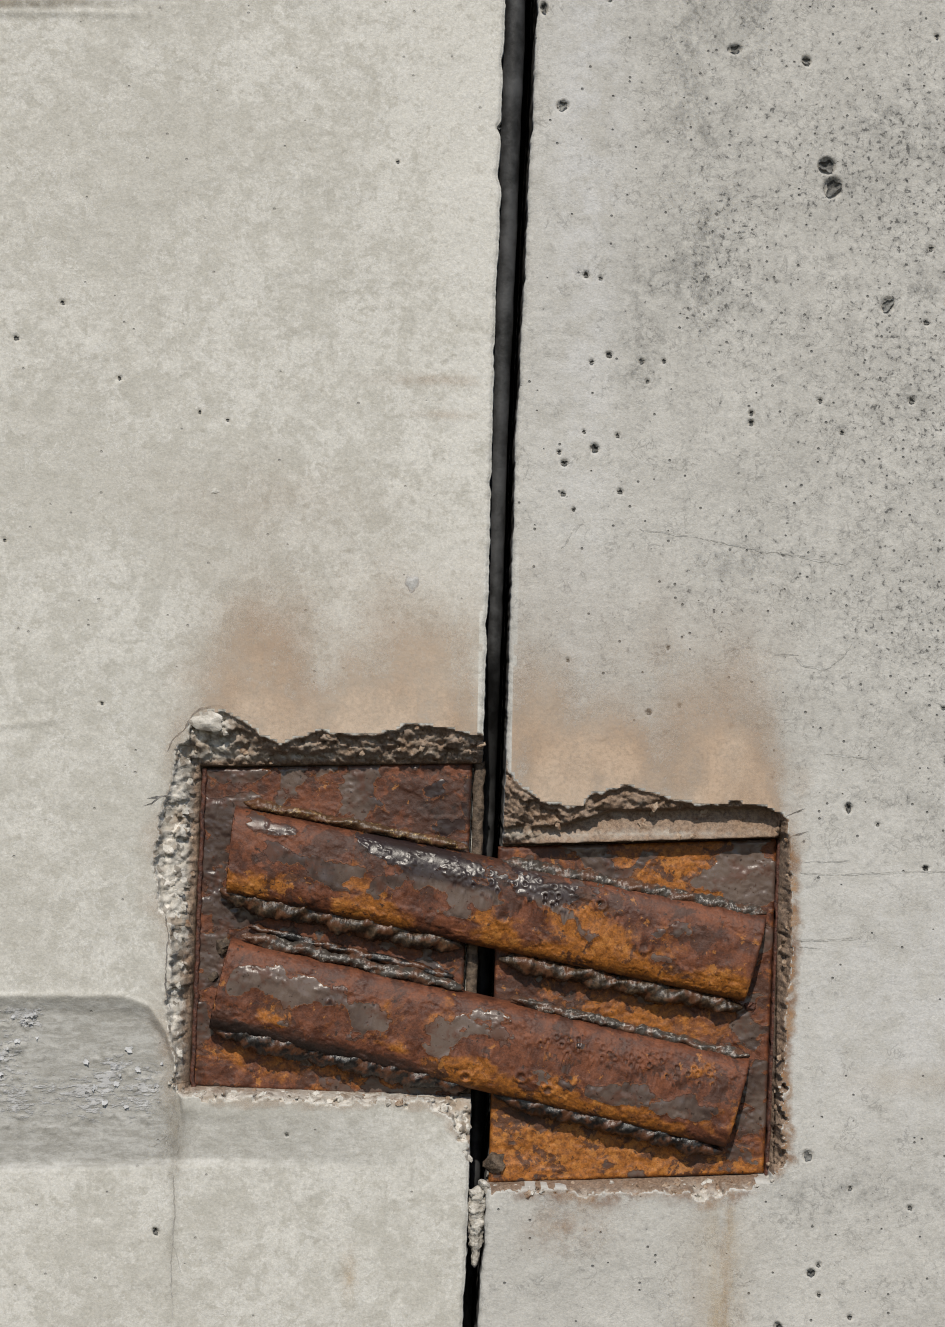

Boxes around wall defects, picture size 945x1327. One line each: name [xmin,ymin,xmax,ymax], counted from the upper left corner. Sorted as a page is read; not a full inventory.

spalling [0,710,486,1163]
rust [204,615,478,743]
spalling [487,760,793,1202]
rust [511,675,780,812]